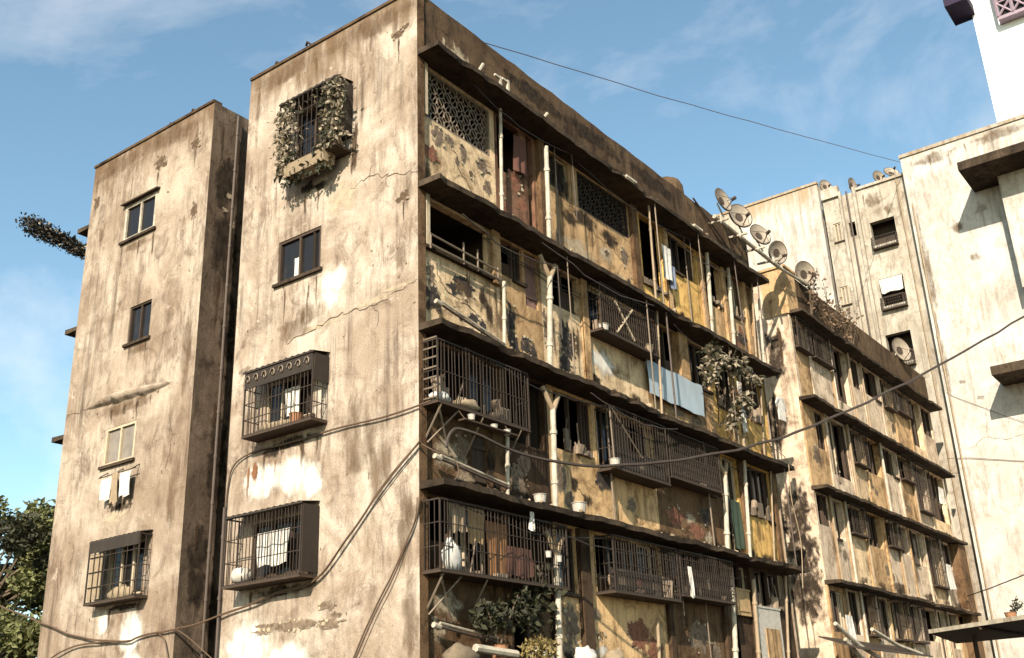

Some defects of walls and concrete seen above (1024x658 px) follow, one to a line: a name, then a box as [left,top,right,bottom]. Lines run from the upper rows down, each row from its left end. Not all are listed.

crack [351,164,417,189]
damp [212,128,240,366]
crack [288,263,489,344]
corrosion [246,462,258,488]
peeling [665,505,710,541]
peeling [252,600,346,636]